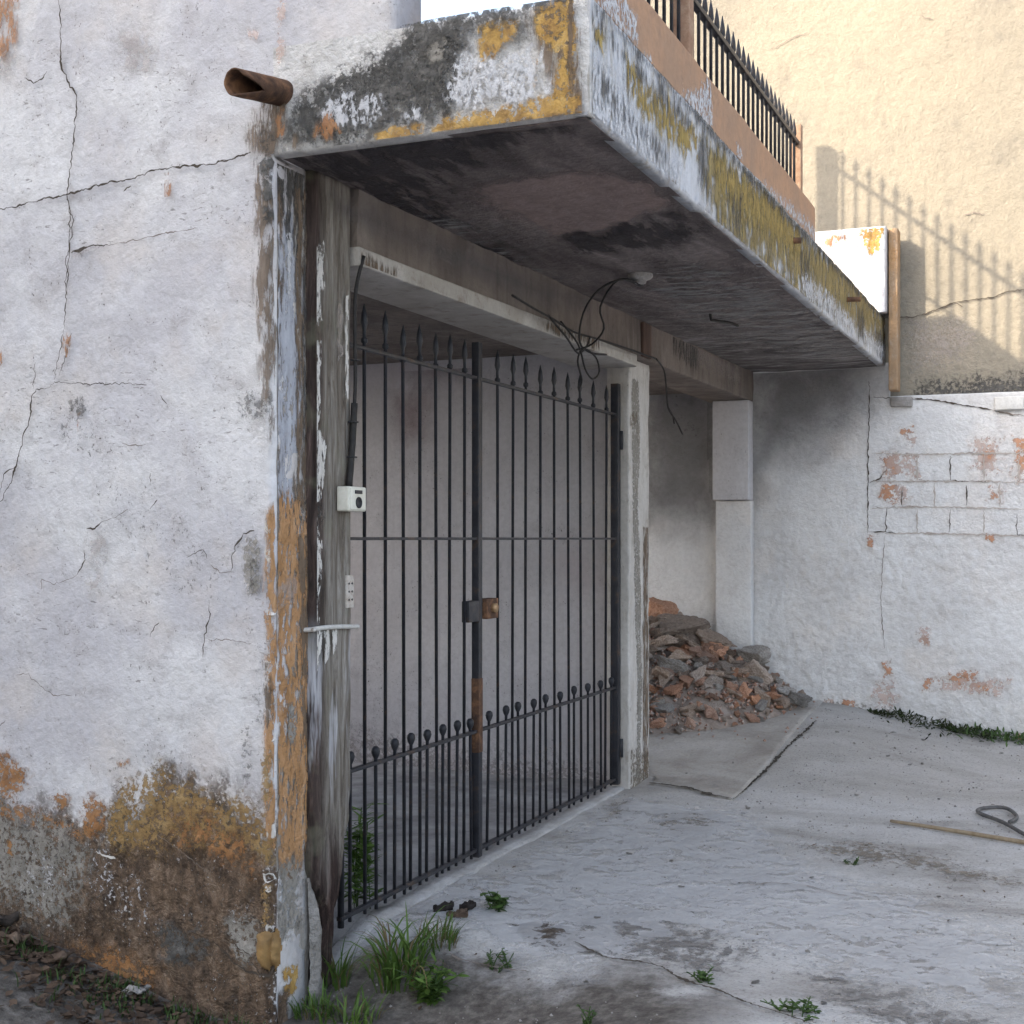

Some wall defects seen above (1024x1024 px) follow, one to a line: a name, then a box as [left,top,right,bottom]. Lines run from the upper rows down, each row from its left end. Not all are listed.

water stain [592,3,886,359]
crack [0,1,251,502]
water stain [242,0,566,523]
crack [900,289,1024,318]
flaking render [879,426,921,505]
flaking render [974,438,997,474]
flaking render [1012,438,1024,479]
crack [41,477,157,589]
crack [202,611,251,652]
flaking render [922,670,1001,696]
water stain [0,763,279,1024]